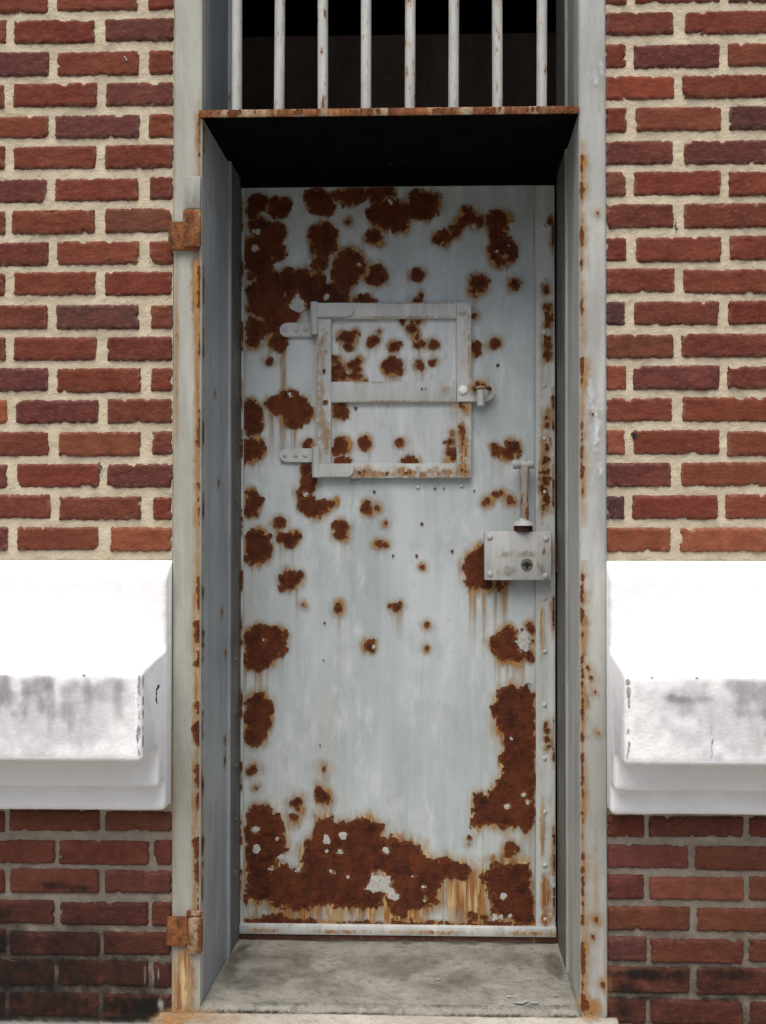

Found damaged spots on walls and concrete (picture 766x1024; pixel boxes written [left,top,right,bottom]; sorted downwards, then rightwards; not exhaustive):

corrosion [241,187,523,490]
corrosion [191,259,205,746]
corrosion [240,487,302,590]
corrosion [296,462,350,543]
corrosion [360,491,394,557]
corrosion [539,394,555,515]
damp [0,675,11,704]
damp [28,677,50,712]
corrosion [191,762,204,910]
corrosion [240,542,555,936]
corrosion [579,571,606,1019]
damp [735,681,766,711]